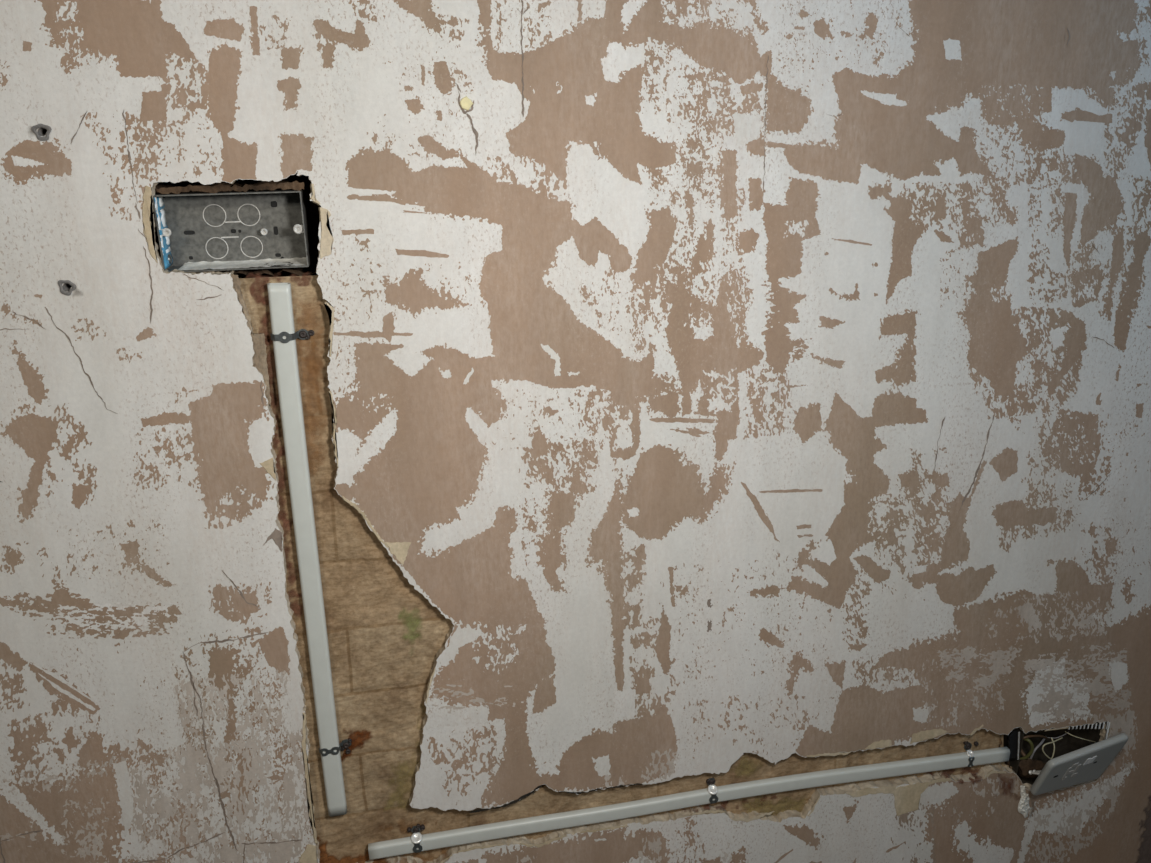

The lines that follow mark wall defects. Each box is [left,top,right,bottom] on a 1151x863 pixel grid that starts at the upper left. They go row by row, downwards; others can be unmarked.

peeling [312,0,385,71]
peeling [0,138,73,190]
peeling [34,0,338,273]
peeling [1,301,42,326]
peeling [71,318,106,341]
peeling [116,327,157,363]
peeling [0,340,97,523]
peeling [133,380,276,529]
peeling [324,0,1151,863]
peeling [0,519,182,653]
peeling [0,582,318,863]